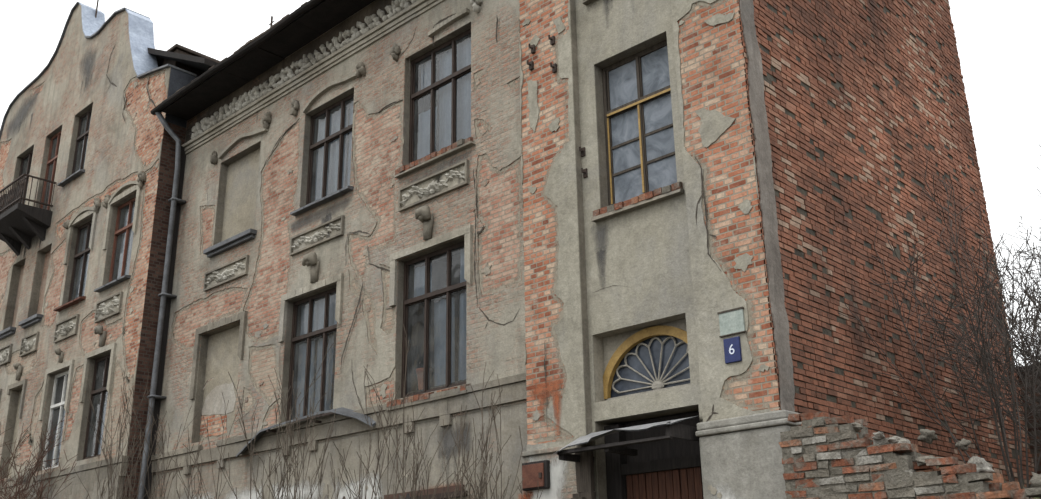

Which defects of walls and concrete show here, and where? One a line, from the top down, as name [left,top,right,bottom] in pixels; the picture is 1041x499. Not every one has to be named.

flaking render [43,70,167,451]
flaking render [172,119,300,437]
crack [341,230,390,408]
flaking render [348,100,404,354]
flaking render [366,367,396,407]
crack [473,169,519,330]
flaking render [474,0,574,445]
peeling [533,459,566,499]
crack [695,157,721,271]
flaking render [678,0,780,411]